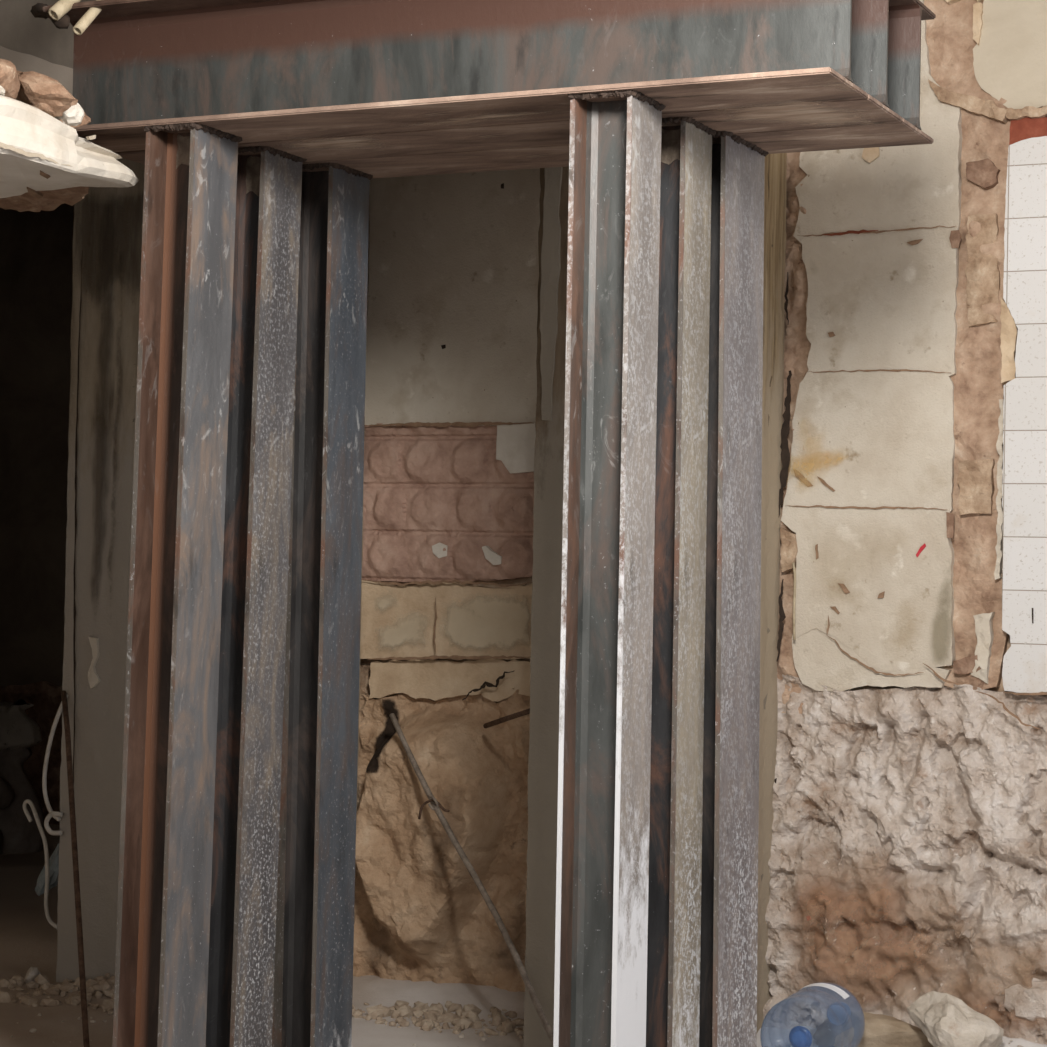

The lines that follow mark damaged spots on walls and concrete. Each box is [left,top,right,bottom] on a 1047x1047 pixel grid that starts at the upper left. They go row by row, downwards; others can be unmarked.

peeling [973,0,983,45]
peeling [0,46,73,96]
peeling [928,79,1047,124]
spalling [862,147,880,163]
spalling [0,186,89,212]
peeling [949,213,1018,384]
damp [93,298,115,585]
spalling [777,152,835,714]
peeling [946,399,1004,580]
crack [366,580,533,700]
peeling [970,612,995,684]
spalling [365,699,399,773]